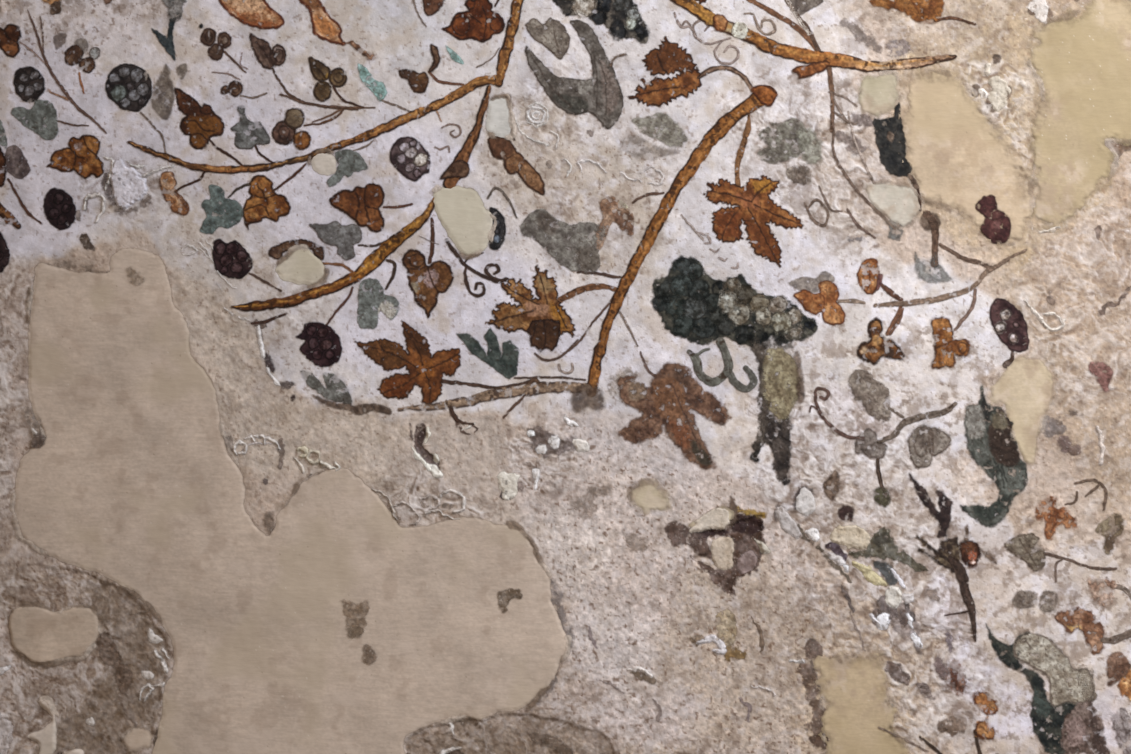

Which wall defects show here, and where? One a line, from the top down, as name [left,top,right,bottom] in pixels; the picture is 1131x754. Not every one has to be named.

flaking render [859,0,1131,246]
flaking render [0,244,573,754]
flaking render [497,415,590,500]
flaking render [990,357,1081,463]
flaking render [665,487,953,679]
flaking render [797,639,935,754]
flaking render [938,716,966,736]